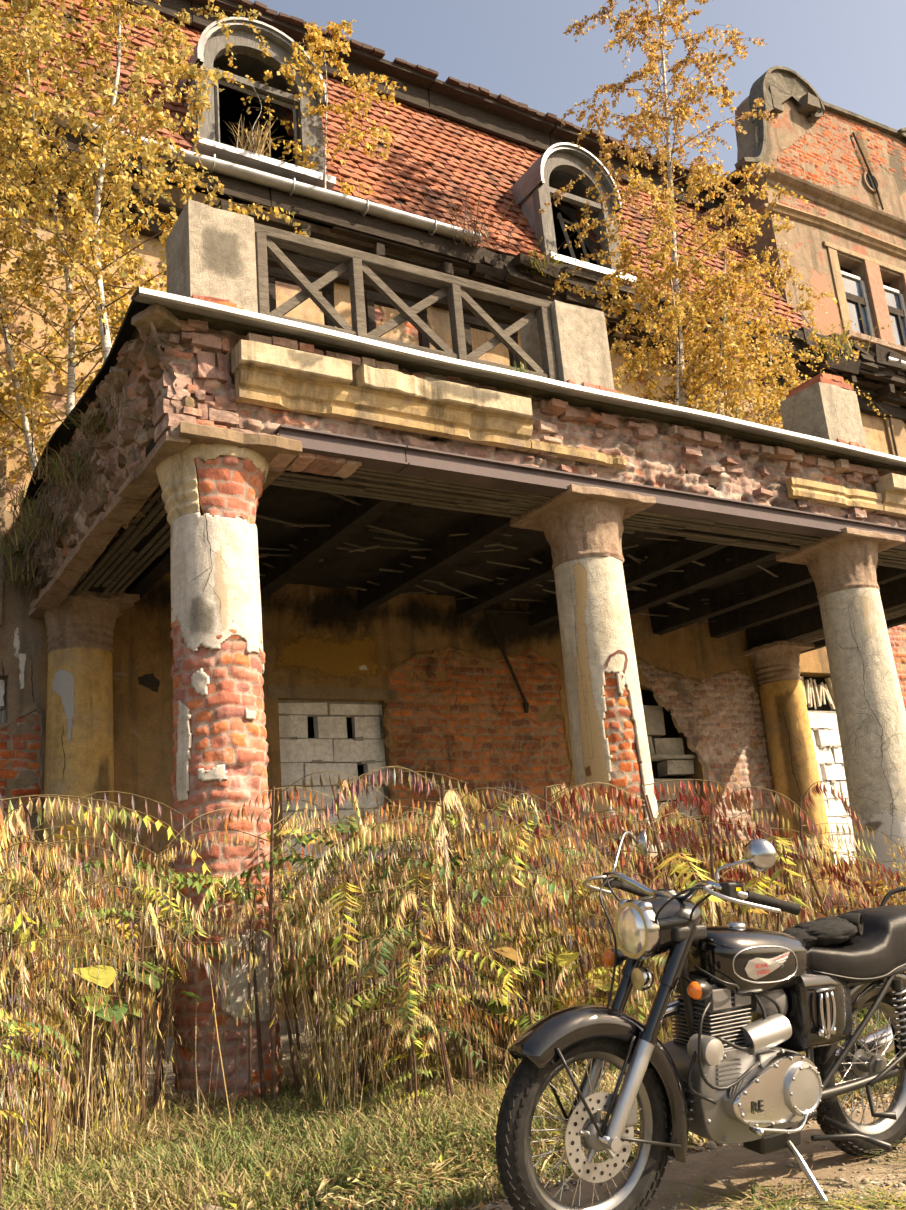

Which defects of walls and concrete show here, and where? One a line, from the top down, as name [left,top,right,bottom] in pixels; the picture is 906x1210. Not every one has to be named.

spalling [772,110,906,190]
spalling [780,195,826,220]
spalling [0,303,265,619]
crack [192,512,228,611]
spalling [0,701,46,814]
peeling [52,669,75,742]
spalling [381,561,787,889]
spalling [887,623,906,711]
spalling [138,607,283,1106]